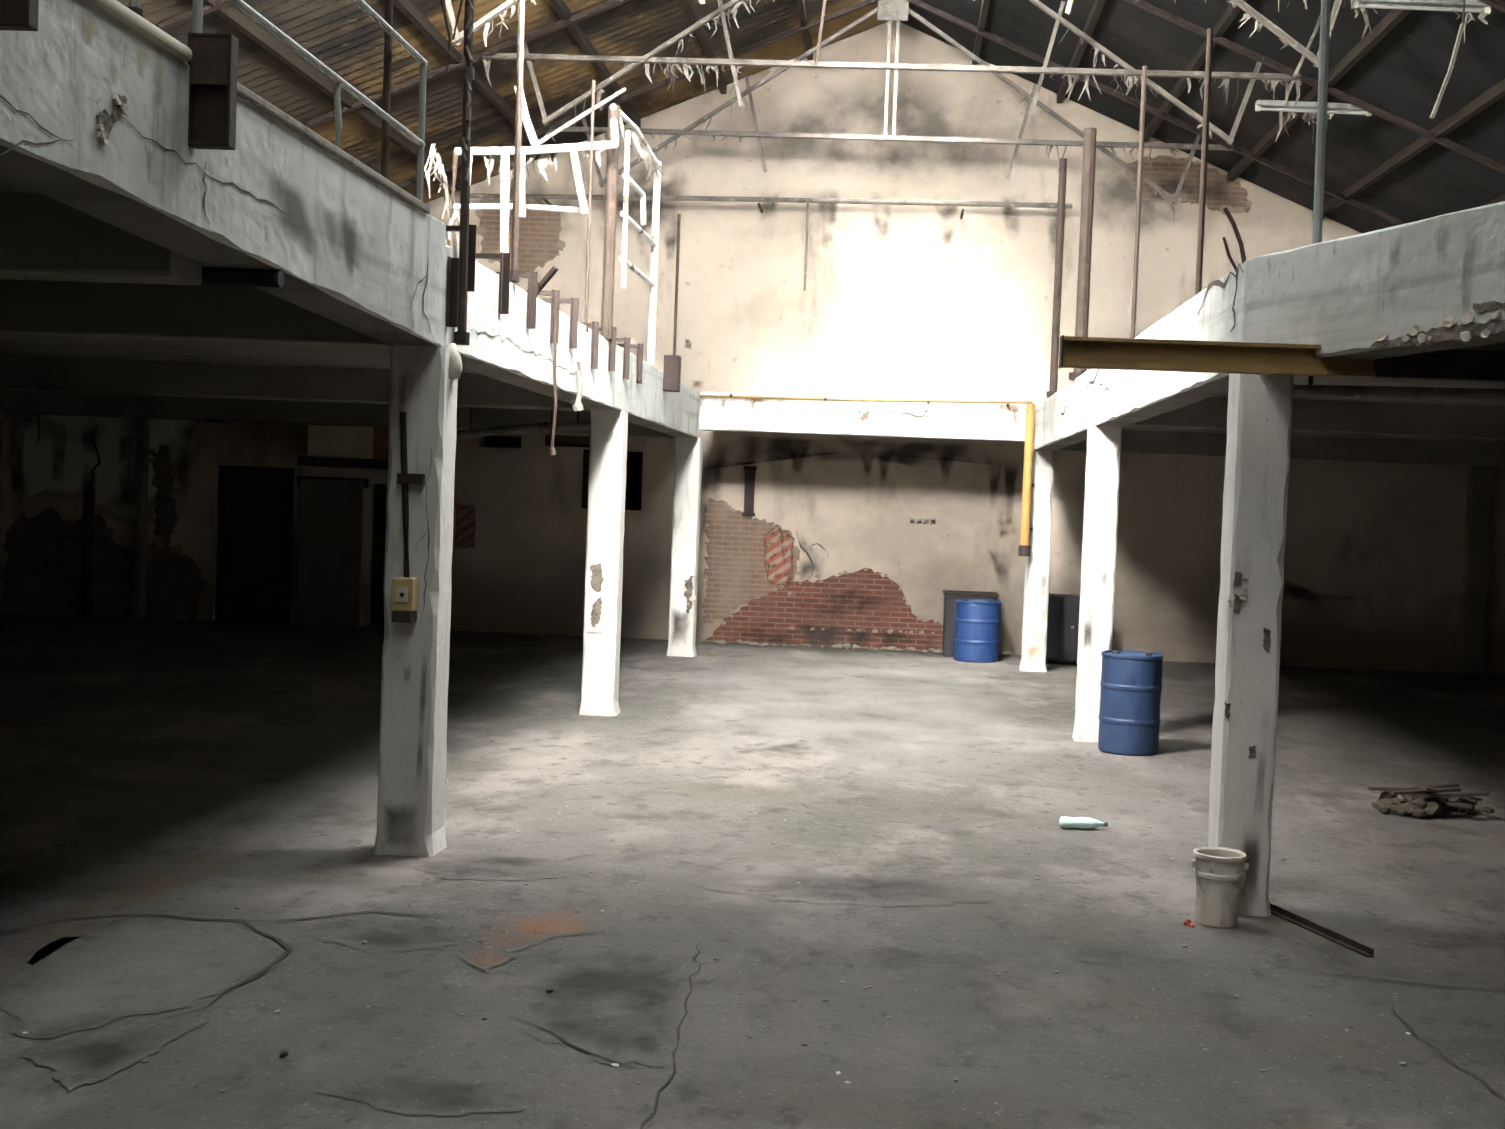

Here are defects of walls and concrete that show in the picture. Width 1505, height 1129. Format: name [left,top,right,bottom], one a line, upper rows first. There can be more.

spalling [96,93,128,145]
crack [120,115,286,224]
spalling [1371,301,1505,348]
leakage [742,438,827,470]
leakage [863,442,968,477]
leakage [991,468,1017,495]
flaking render [673,498,943,651]
crack [509,942,701,1129]